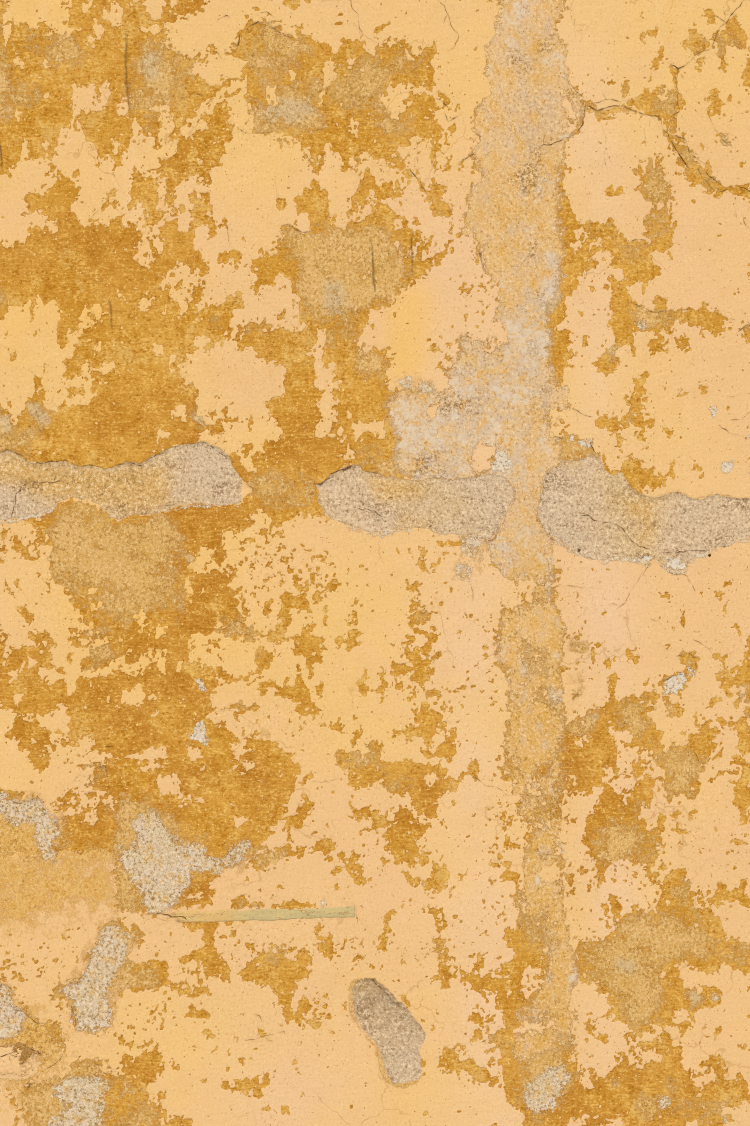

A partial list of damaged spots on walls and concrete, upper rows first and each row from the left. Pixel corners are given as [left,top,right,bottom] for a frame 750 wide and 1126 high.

peeling [279,0,311,10]
crack [543,2,750,226]
peeling [276,198,287,211]
flaking render [691,457,750,483]
peeling [700,580,737,615]
peeling [17,606,34,627]
peeling [224,698,260,728]
peeling [231,885,326,912]
peeling [373,898,412,965]
spalling [342,978,436,1089]